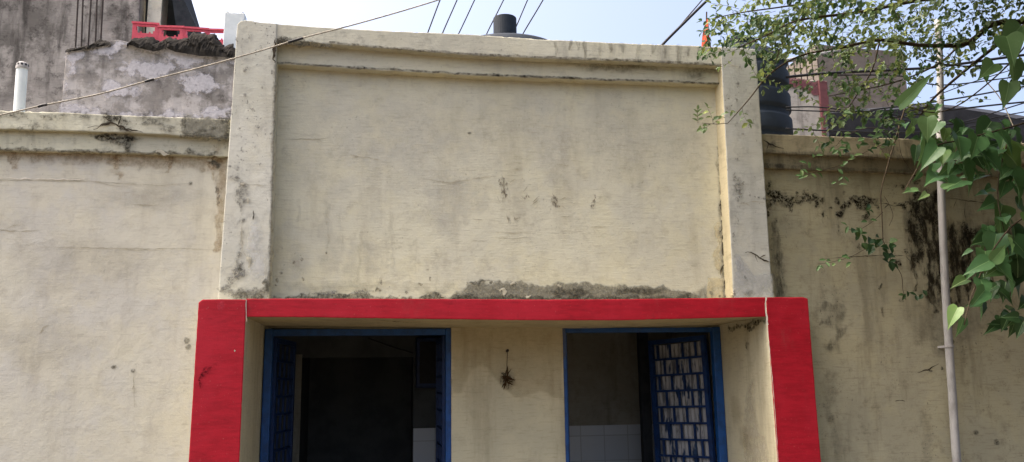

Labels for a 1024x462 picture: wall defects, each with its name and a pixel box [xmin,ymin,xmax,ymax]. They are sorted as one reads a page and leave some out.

crack [87,116,143,133]
mould [766,182,879,219]
leakage [894,175,994,312]
spalling [220,252,749,300]